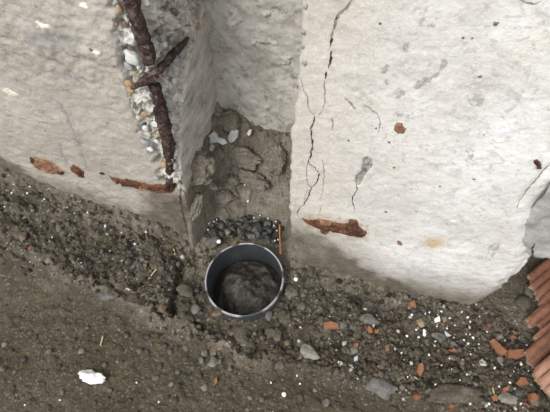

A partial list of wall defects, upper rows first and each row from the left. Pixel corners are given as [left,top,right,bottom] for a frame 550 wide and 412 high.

spalling [110,0,201,190]
crack [297,0,352,215]
rust [394,122,406,134]
flaking render [208,129,239,151]
rust [30,156,85,178]
rust [99,172,182,194]
rust [302,218,367,238]